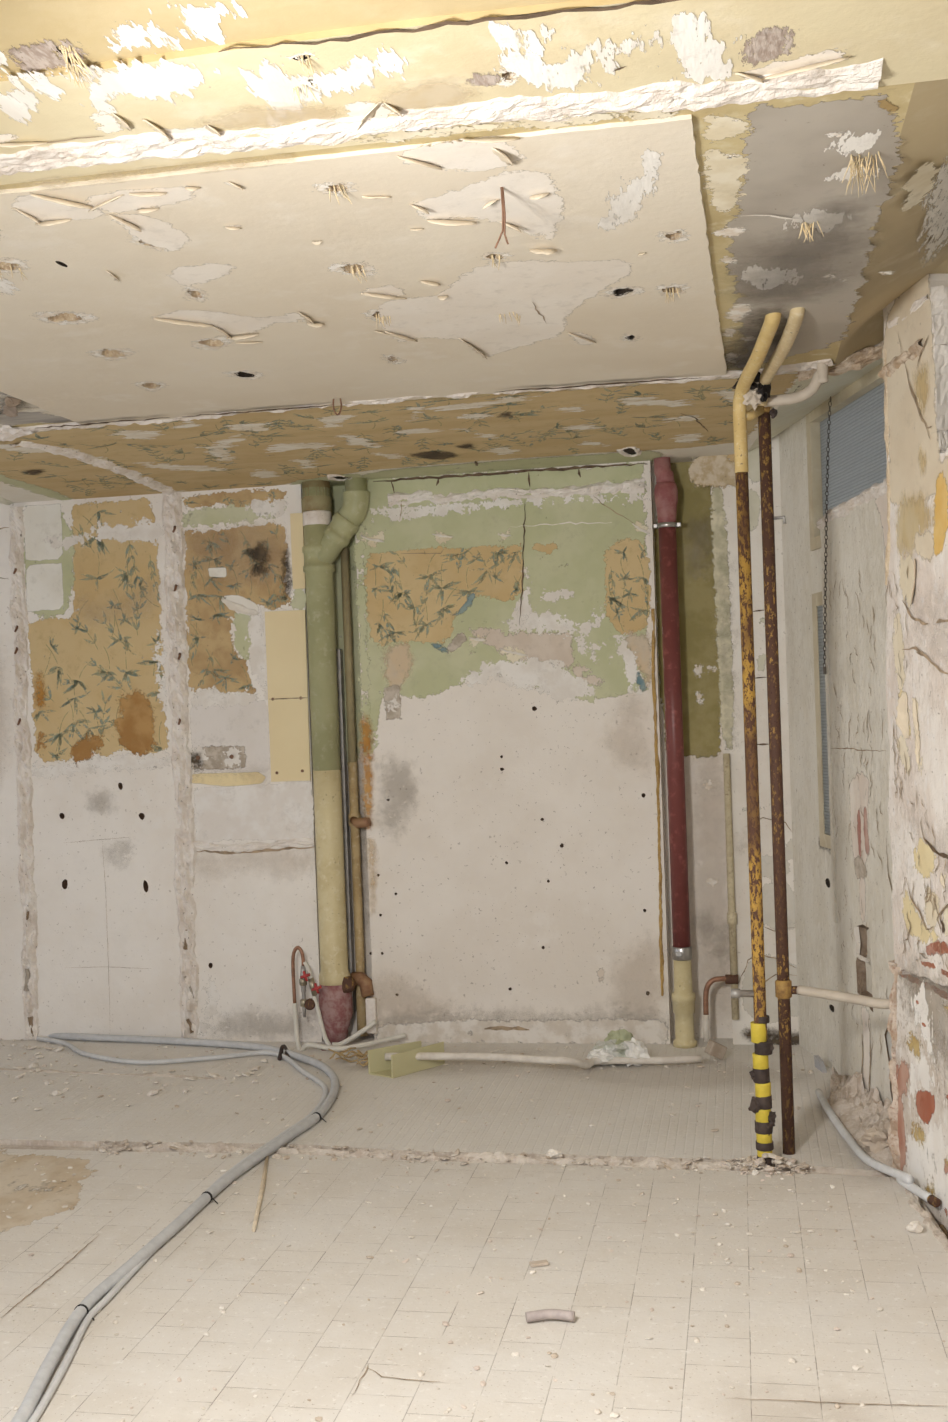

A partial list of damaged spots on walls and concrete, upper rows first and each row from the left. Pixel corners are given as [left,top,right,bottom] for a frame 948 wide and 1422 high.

spalling [0,39,106,89]
spalling [466,66,521,87]
peeling [735,26,850,83]
peeling [11,186,325,350]
peeling [328,101,691,364]
peeling [0,394,59,427]
spalling [225,370,263,380]
peeling [700,93,948,776]
rust [360,717,372,829]
peeling [181,447,736,996]
peeling [902,838,948,978]
spalling [861,960,948,1171]